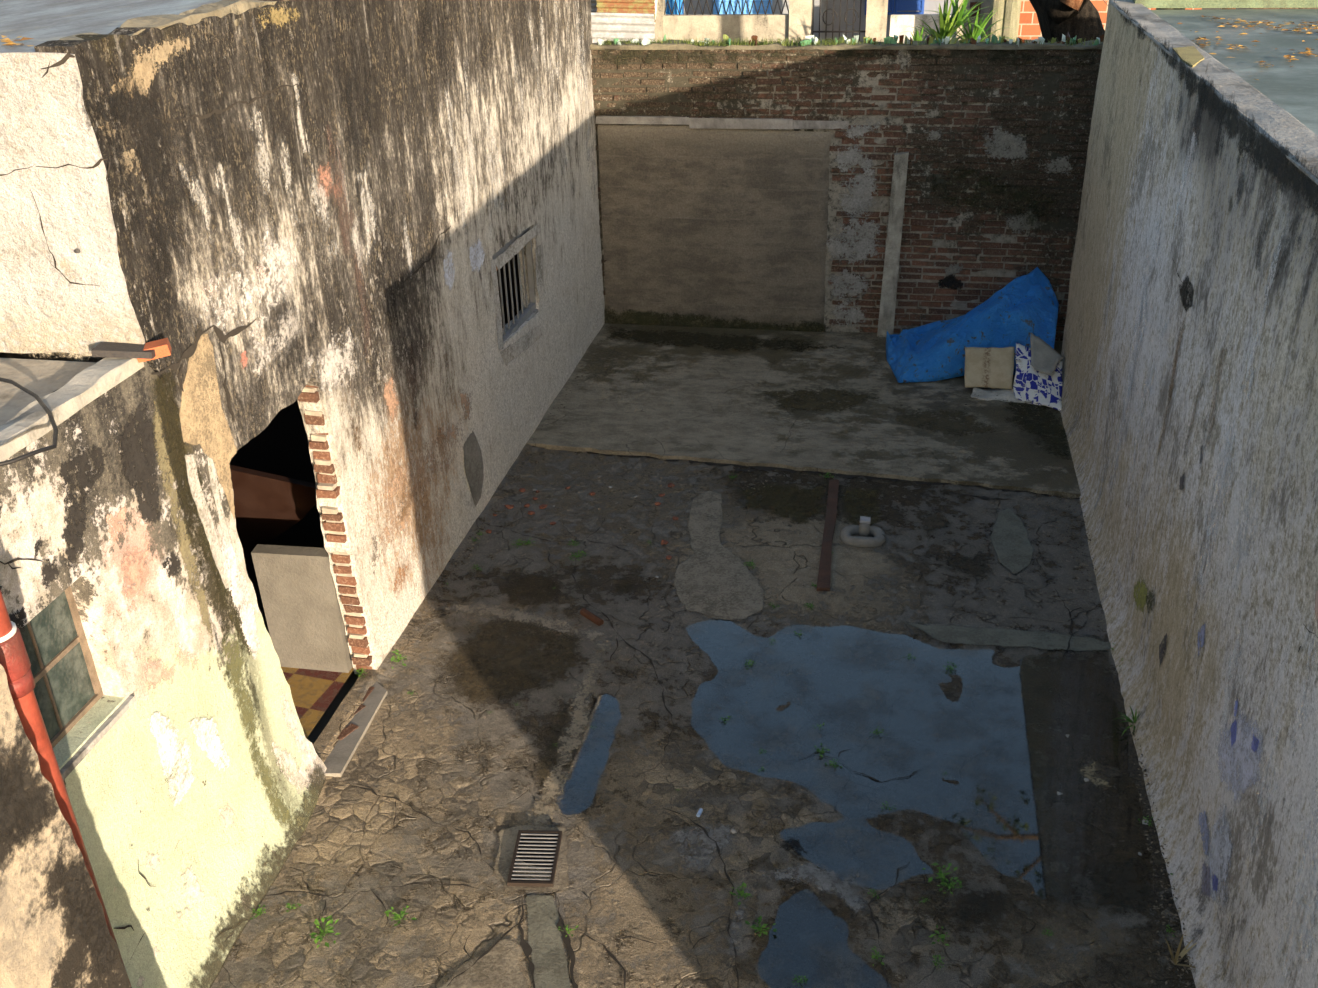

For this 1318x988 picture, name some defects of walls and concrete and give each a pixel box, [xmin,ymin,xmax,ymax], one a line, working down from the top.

crack [0,159,111,286]
crack [41,53,75,78]
water stain [76,50,360,395]
water stain [249,12,329,223]
water stain [1114,0,1318,313]
peeling [384,377,401,423]
peeling [372,389,470,575]
peeling [393,565,409,598]
water stain [34,371,326,988]
peeling [147,712,230,809]
crack [224,784,524,986]
crack [577,931,656,988]